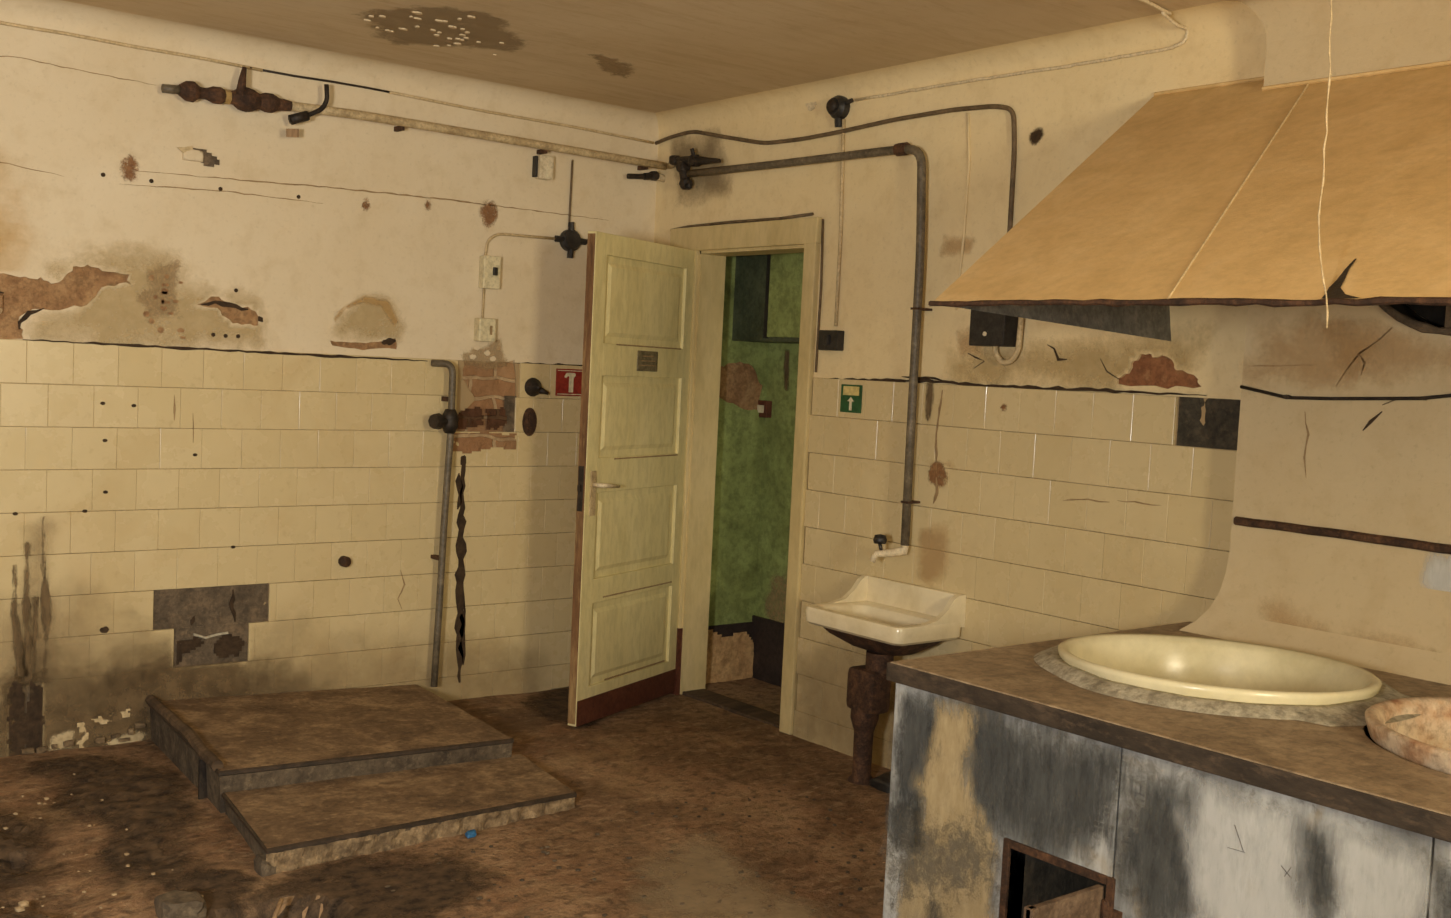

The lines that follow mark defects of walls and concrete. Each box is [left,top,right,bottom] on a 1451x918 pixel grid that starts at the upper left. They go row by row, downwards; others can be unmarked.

spalling [0,263,186,339]
spalling [197,296,263,326]
spalling [330,338,397,350]
flaking render [453,341,517,454]
rust [925,382,947,504]
peeling [1119,354,1241,450]
water stain [11,518,51,683]
peeling [153,583,269,668]
water stain [49,731,74,750]
water stain [898,704,995,918]
water stain [1192,787,1305,918]
water stain [1337,831,1422,918]